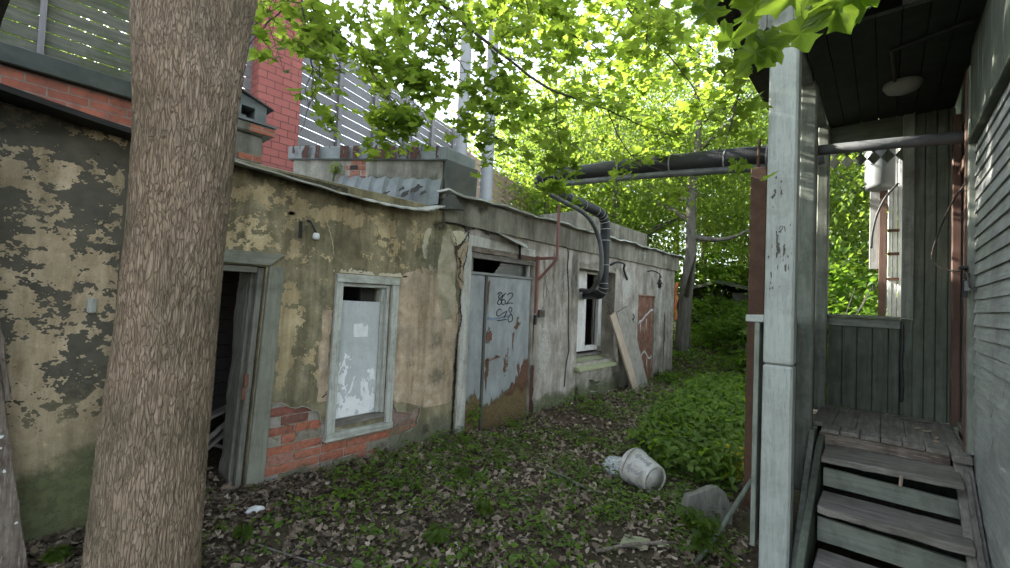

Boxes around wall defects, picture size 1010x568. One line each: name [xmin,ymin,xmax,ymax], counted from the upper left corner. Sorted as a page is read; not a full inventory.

peeling [0,126,128,486]
peeling [225,176,458,483]
crack [446,222,500,436]
rust [464,317,534,433]